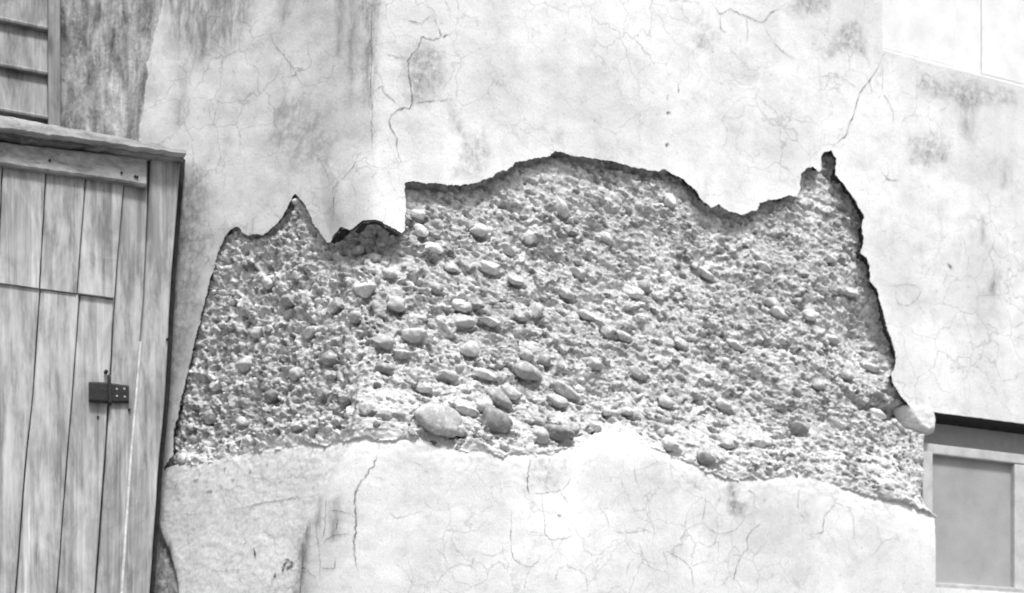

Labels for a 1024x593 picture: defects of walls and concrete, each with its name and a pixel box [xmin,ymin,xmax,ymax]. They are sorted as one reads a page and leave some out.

peeling [60,0,163,141]
spalling [163,150,937,518]